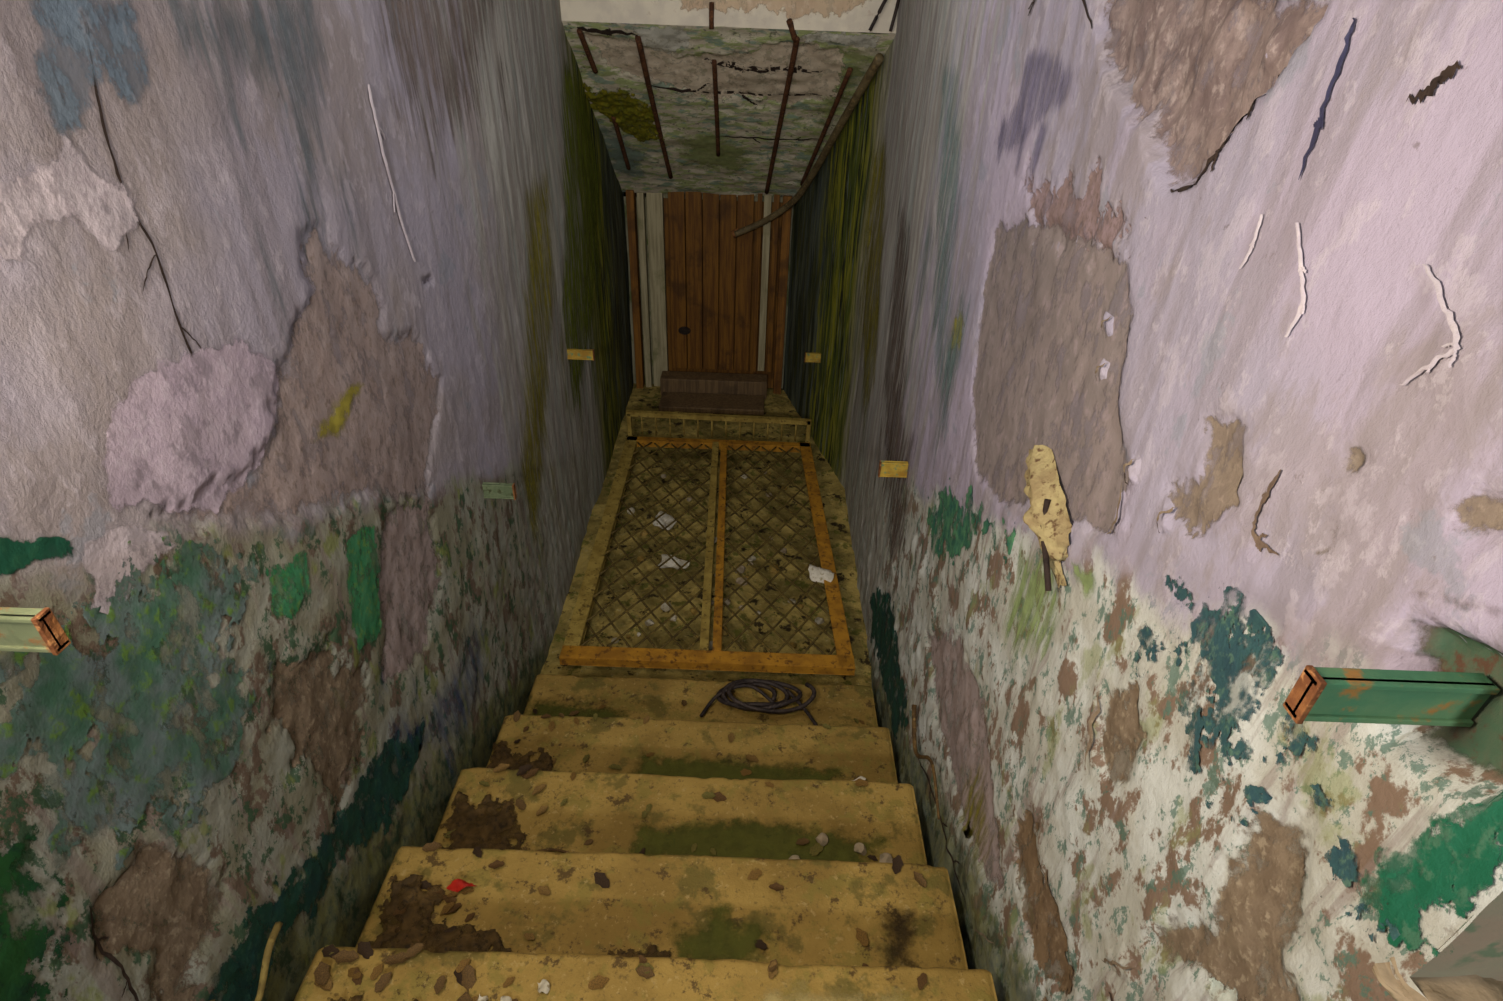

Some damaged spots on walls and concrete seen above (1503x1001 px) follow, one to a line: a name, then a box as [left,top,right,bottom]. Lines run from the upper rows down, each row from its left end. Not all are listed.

crack [87,24,201,358]
spalling [577,0,881,194]
flaking render [1104,0,1329,184]
flaking render [927,156,1146,566]
flaking render [1168,416,1245,539]
peeling [0,228,441,1001]
peeling [1100,575,1317,809]
flaking render [1155,783,1503,1001]